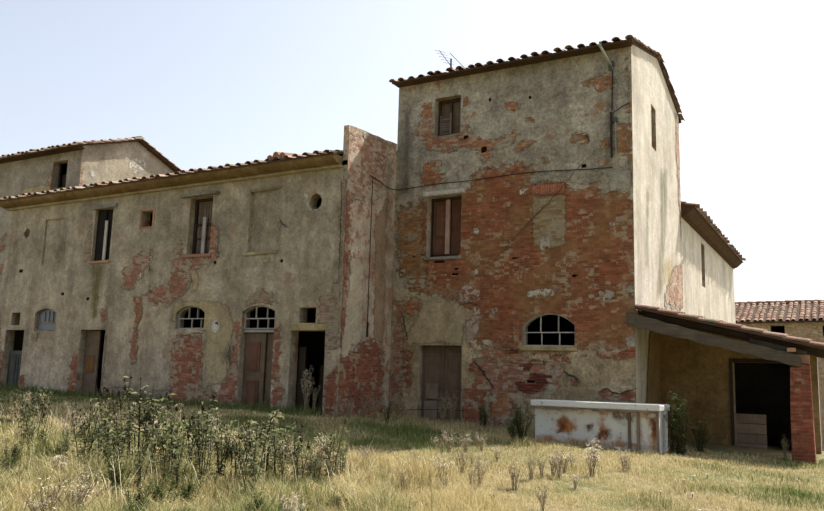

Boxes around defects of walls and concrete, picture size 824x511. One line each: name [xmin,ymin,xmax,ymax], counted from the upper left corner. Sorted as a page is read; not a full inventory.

spalling [316,57,636,428]
spalling [122,219,219,364]
spalling [664,263,683,311]
spalling [101,320,241,406]
corrosion [530,406,659,450]